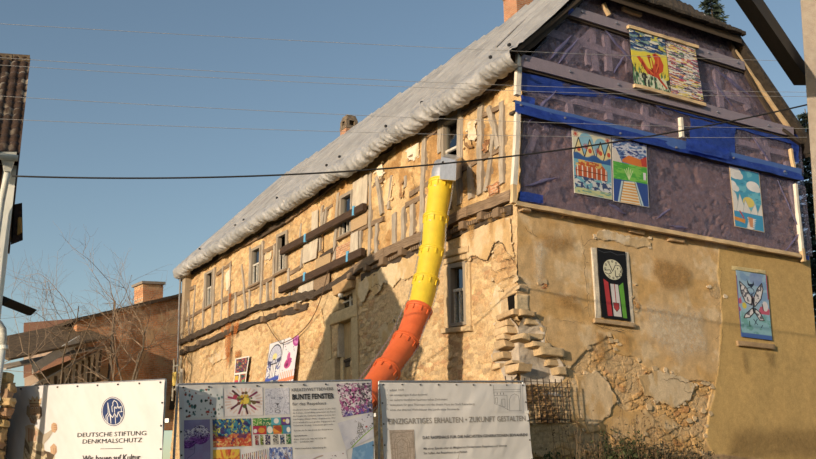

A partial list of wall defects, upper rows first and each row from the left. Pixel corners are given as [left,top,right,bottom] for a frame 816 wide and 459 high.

peeling [356,253,418,302]
spalling [455,217,715,459]